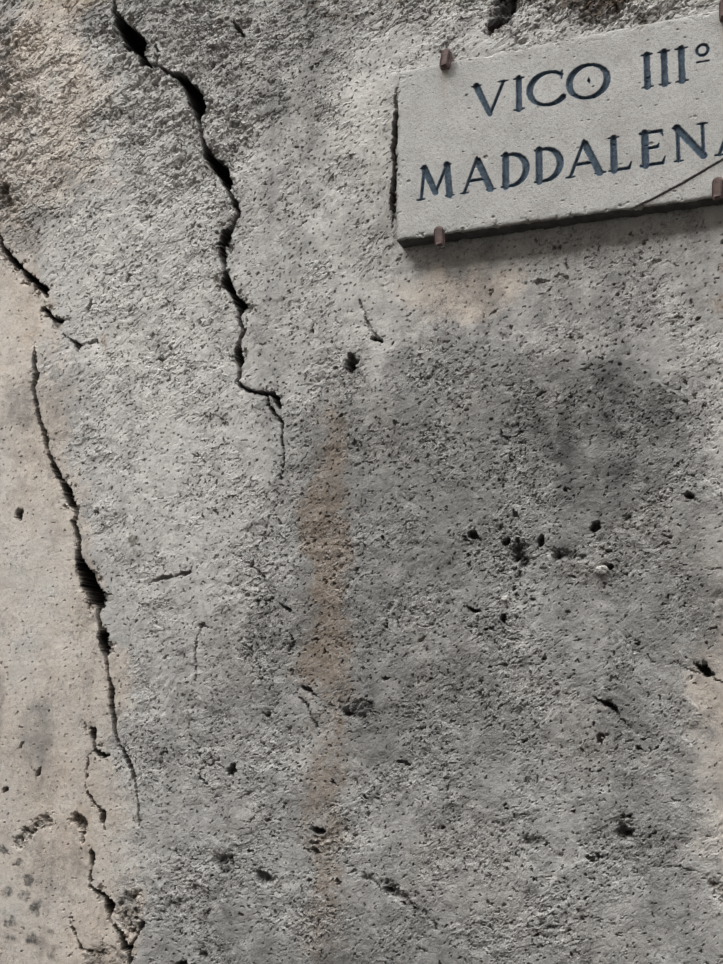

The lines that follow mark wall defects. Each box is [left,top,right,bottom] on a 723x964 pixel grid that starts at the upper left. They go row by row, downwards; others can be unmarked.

crack [0,232,99,351]
crack [110,0,296,655]
crack [700,564,723,572]
crack [30,346,145,964]
crack [192,622,218,682]
crack [631,647,723,683]
crack [296,685,320,729]
spalling [695,864,723,923]